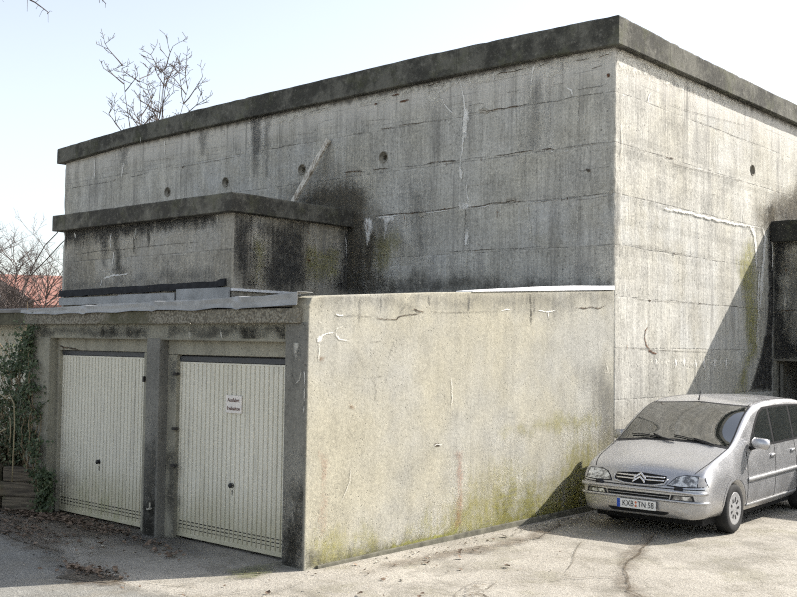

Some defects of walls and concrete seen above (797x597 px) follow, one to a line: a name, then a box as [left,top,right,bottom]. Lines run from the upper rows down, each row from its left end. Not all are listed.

water stain [100,232,127,286]
water stain [357,216,514,294]
water stain [655,207,797,391]
crack [292,304,423,387]
water stain [282,491,303,568]
crack [624,535,654,597]